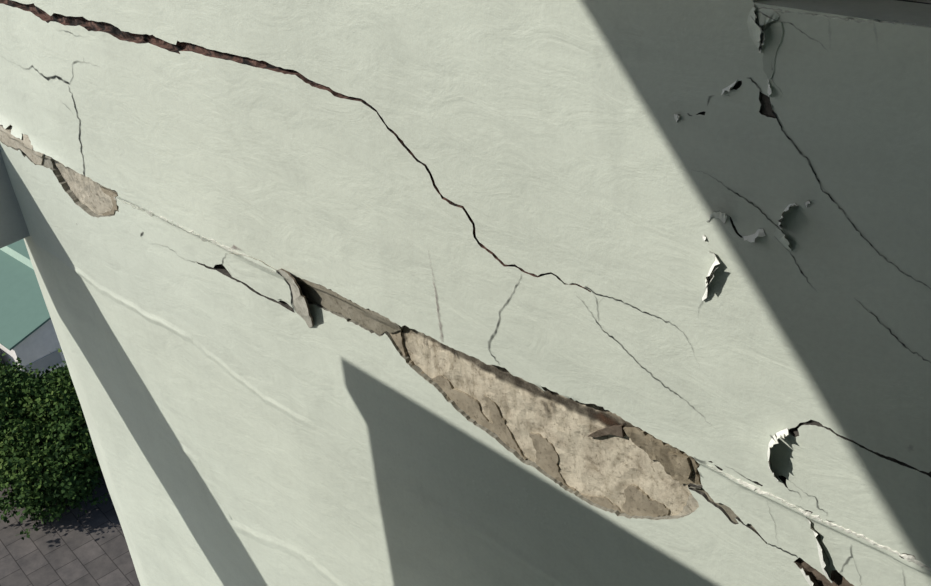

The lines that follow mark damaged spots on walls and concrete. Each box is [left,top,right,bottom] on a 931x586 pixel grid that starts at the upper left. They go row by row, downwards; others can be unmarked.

peeling [721,80,742,95]
peeling [747,4,784,97]
spalling [0,125,119,218]
crack [0,0,675,359]
crack [749,78,927,286]
peeling [708,188,811,275]
peeling [702,251,720,301]
crack [595,320,681,398]
spalling [276,268,931,586]
crack [767,420,931,491]
crack [688,483,797,557]